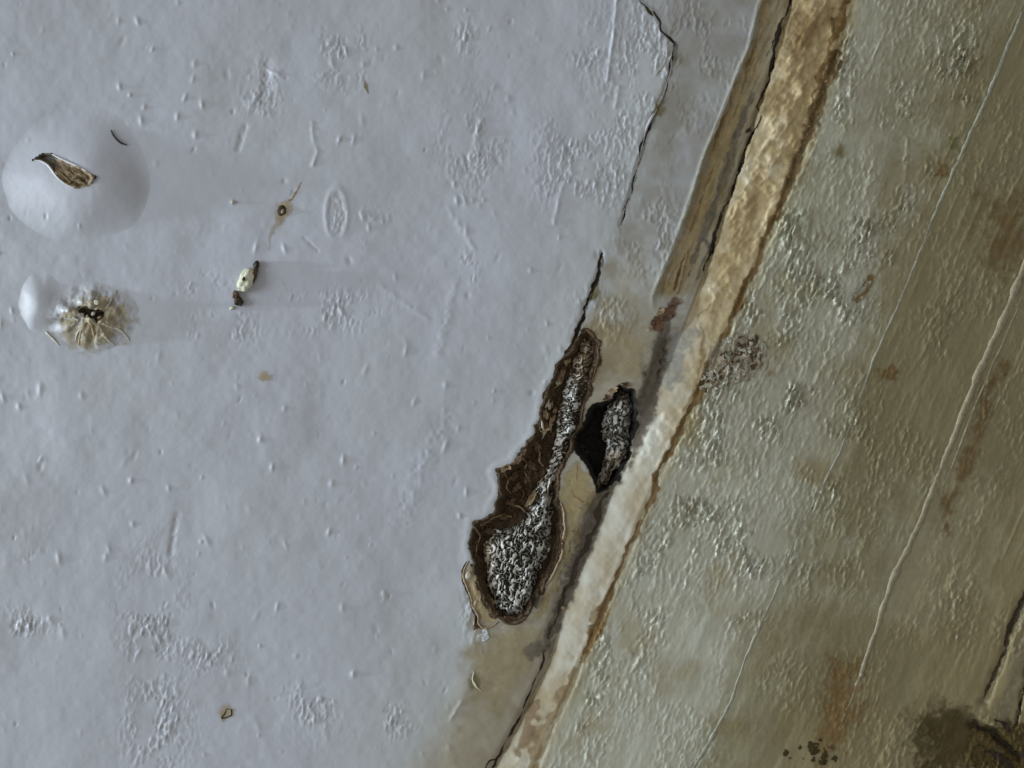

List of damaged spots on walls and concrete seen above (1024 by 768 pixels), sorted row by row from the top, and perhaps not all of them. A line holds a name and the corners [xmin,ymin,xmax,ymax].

crack [618,2,676,226]
crack [696,0,792,280]
rust [268,183,301,249]
crack [562,253,603,358]
rust [648,297,683,355]
damp [515,0,863,768]
peeling [699,330,767,393]
flaking render [461,328,640,642]
damp [913,701,981,768]